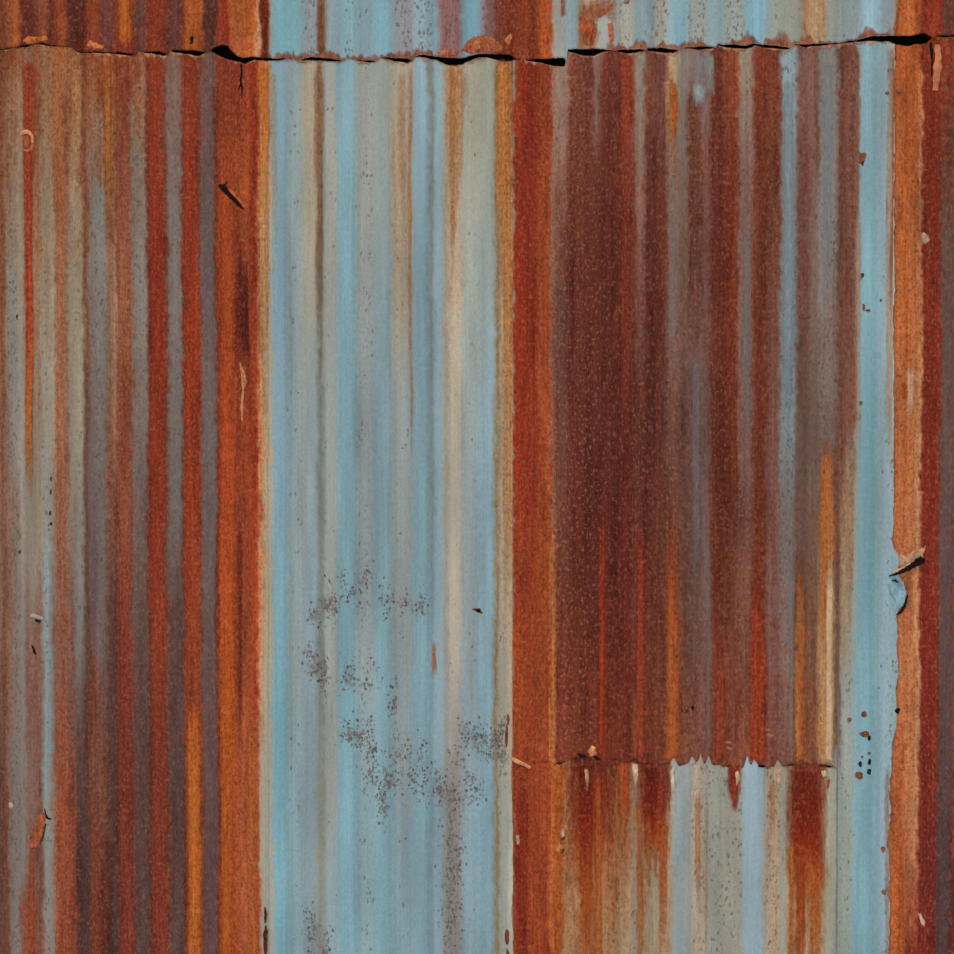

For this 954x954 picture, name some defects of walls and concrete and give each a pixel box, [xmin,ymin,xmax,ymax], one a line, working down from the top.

rust [23,64,36,477]
rust [234,60,275,314]
rust [275,0,512,563]
crack [0,33,954,98]
rust [521,0,894,435]
rust [186,706,202,954]
rust [220,537,242,954]
rust [334,710,509,954]
rust [555,527,679,954]
rust [728,765,740,809]
rust [787,451,849,954]
peeling [887,576,908,615]